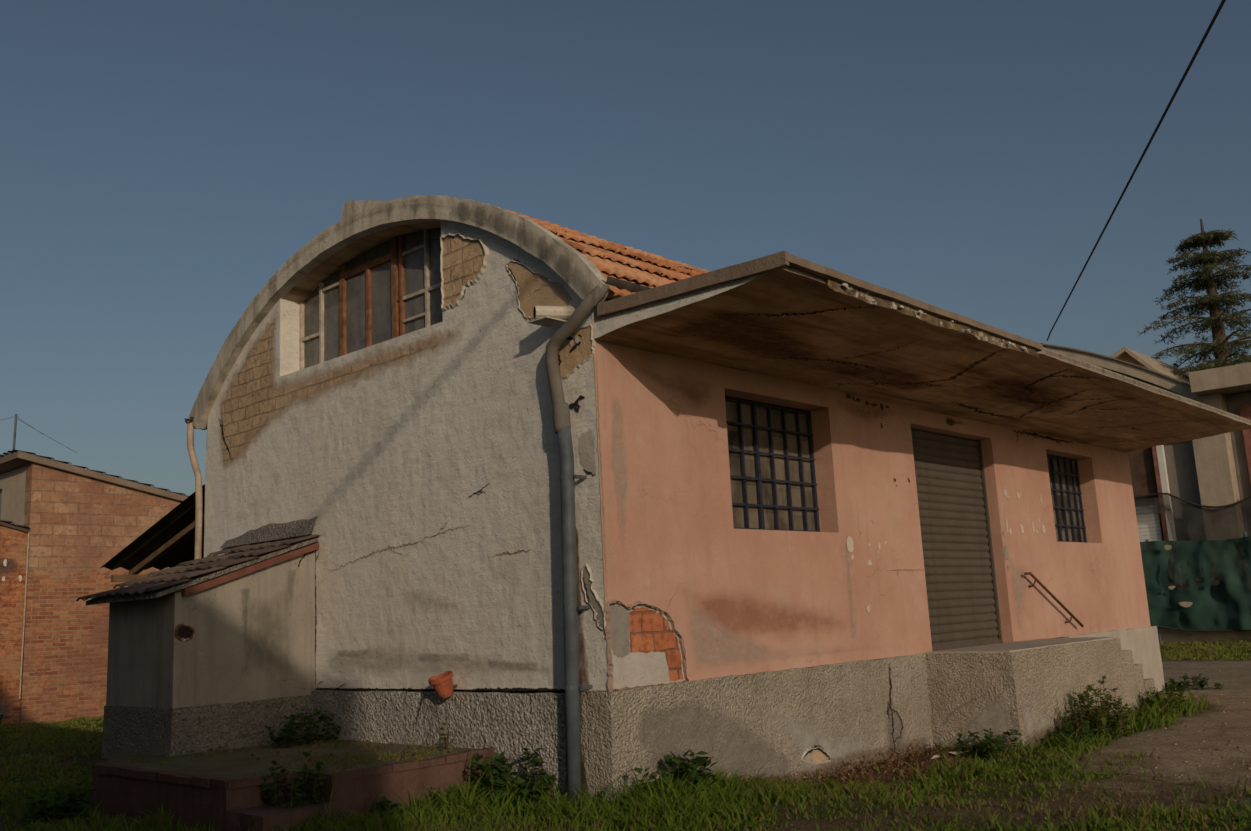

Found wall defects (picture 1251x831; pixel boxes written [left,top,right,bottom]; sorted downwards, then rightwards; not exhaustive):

flaking render [440,231,490,312]
flaking render [506,259,573,320]
spalling [827,279,1039,358]
crack [297,483,490,726]
flaking render [581,563,689,692]
crack [888,664,903,752]
spalling [801,745,832,765]